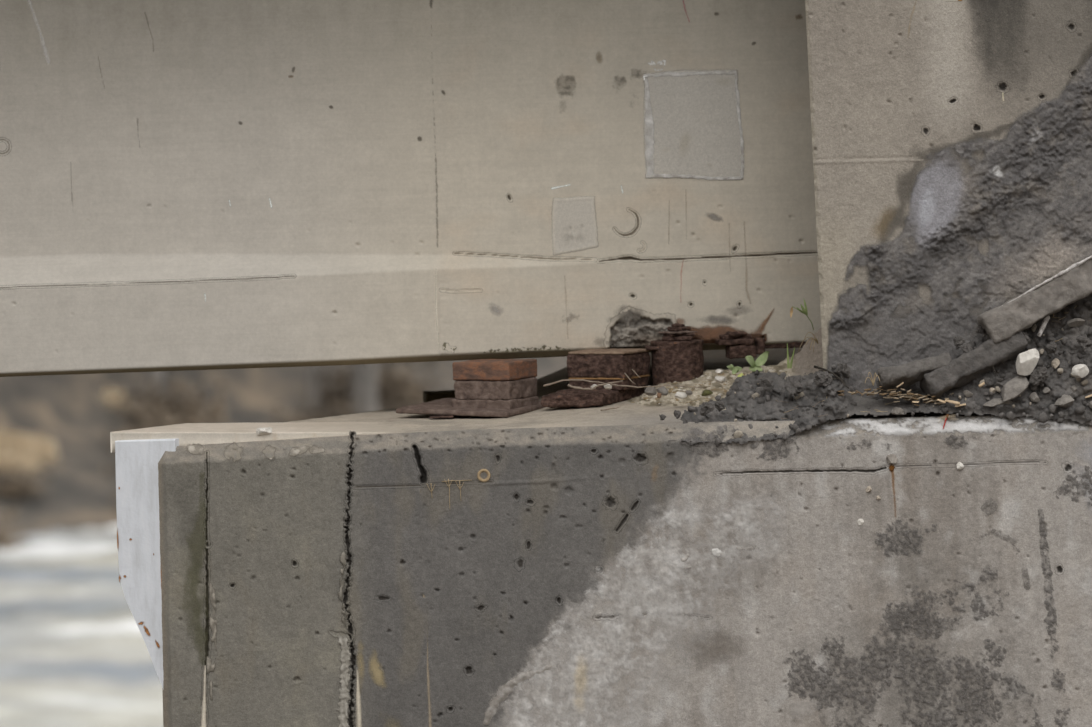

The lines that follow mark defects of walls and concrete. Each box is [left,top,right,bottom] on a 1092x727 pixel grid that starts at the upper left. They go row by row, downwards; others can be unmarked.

water stain [882,175,916,241]
spalling [603,306,678,347]
spalling [1029,387,1051,402]
crack [713,460,1048,476]
crack [328,431,494,727]